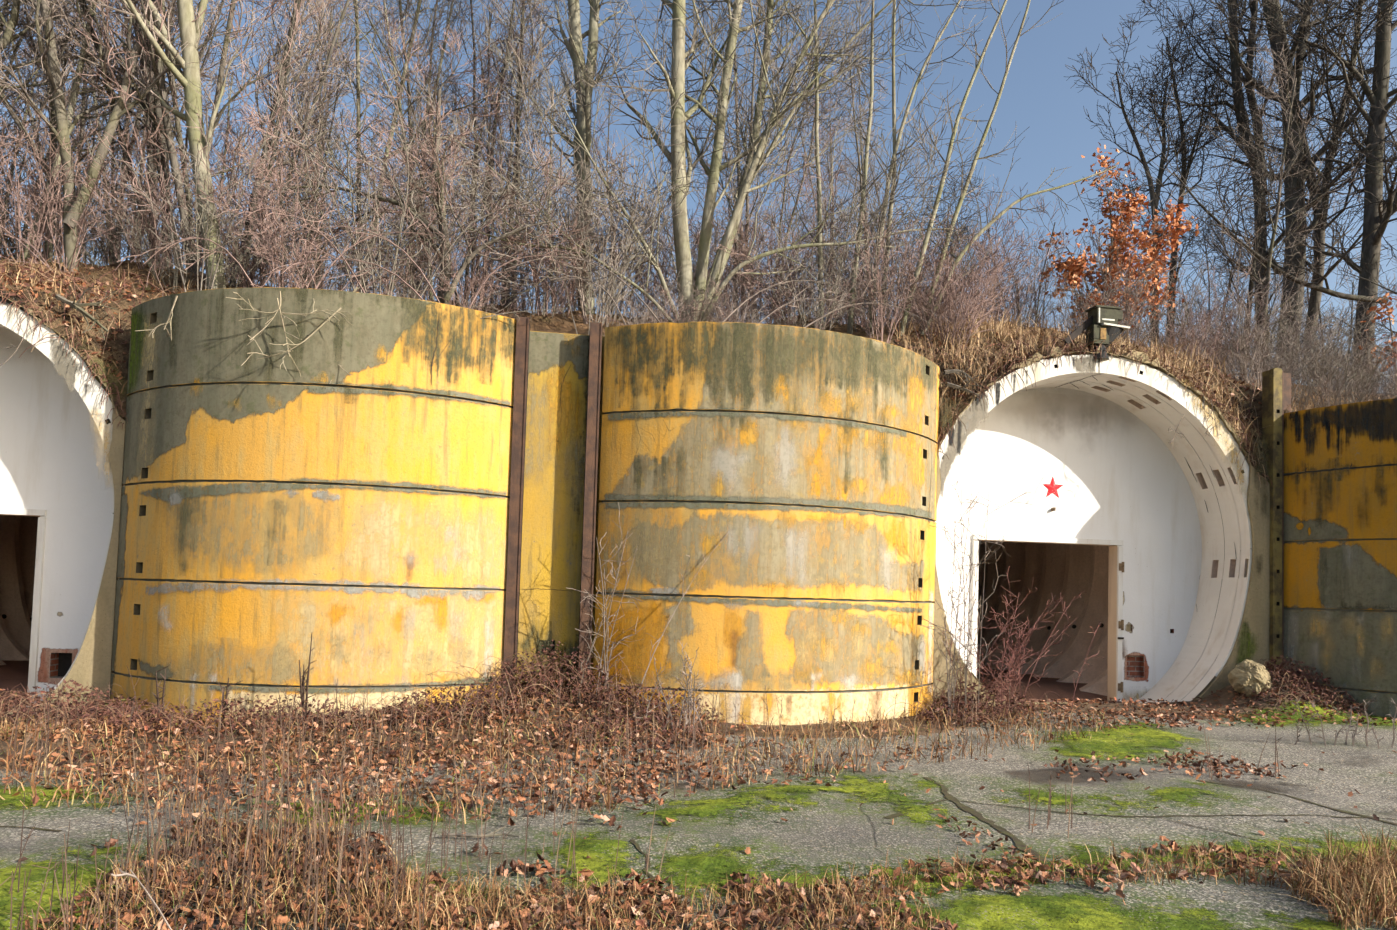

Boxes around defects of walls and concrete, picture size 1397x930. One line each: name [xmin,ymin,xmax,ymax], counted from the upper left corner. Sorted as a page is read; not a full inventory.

peeling [99,288,432,694]
peeling [599,322,988,686]
peeling [1283,513,1397,718]
crack [884,777,1397,862]